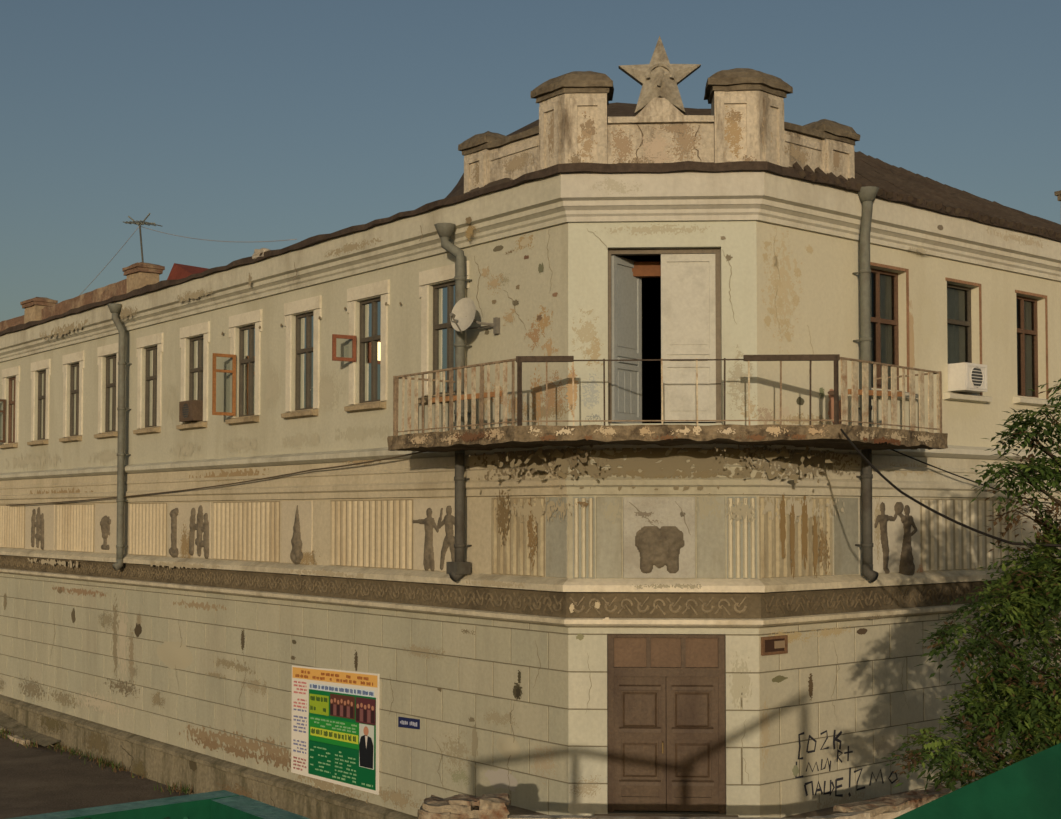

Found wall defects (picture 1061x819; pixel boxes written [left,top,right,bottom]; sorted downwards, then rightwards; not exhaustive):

peeling [634,125,679,163]
peeling [724,105,745,158]
peeling [493,232,544,273]
peeling [479,266,520,326]
crack [723,251,737,324]
corrosion [484,365,579,441]